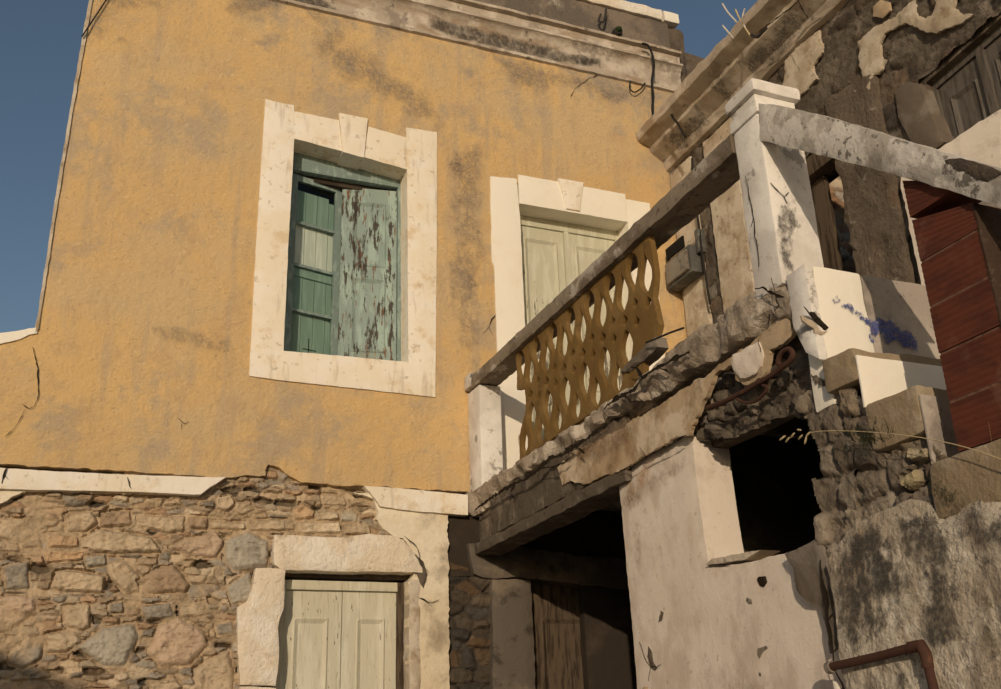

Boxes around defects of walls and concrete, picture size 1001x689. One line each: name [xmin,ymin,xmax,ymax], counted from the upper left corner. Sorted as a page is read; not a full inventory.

damp [432,18,600,64]
crack [756,0,809,34]
flaking render [767,0,1001,142]
flaking render [670,117,730,174]
peeling [945,158,1001,182]
flaking render [700,204,724,324]
crack [6,347,39,436]
crack [475,351,690,510]
spalling [0,466,389,689]
crack [820,560,845,689]
damp [836,519,956,654]
damp [965,510,1001,544]